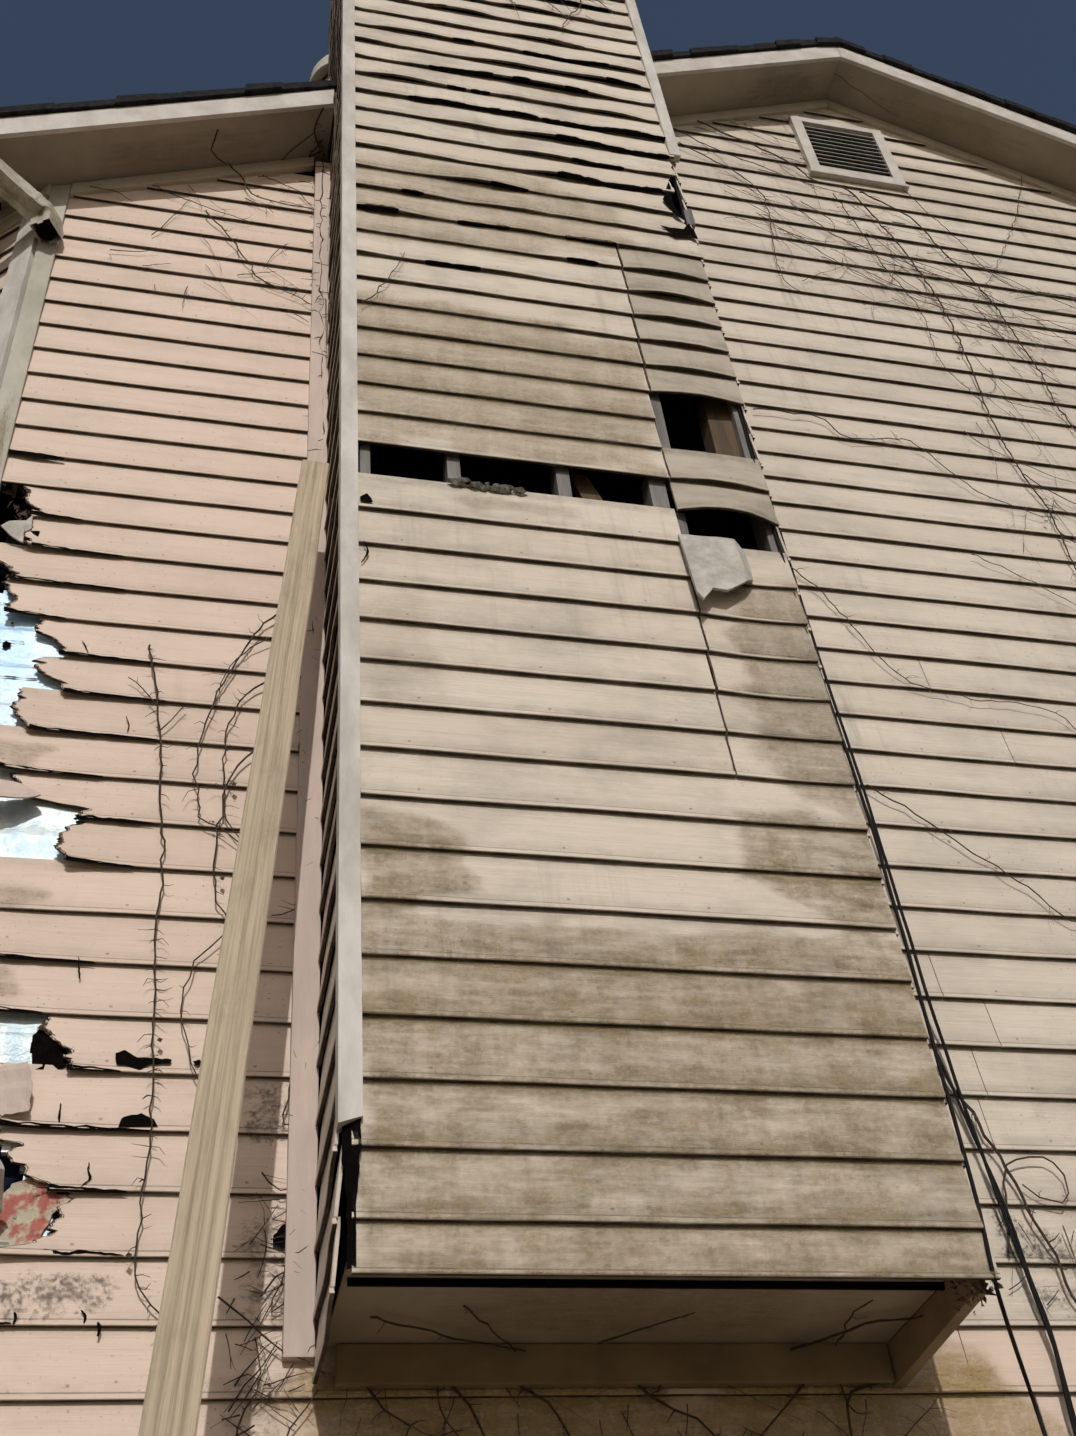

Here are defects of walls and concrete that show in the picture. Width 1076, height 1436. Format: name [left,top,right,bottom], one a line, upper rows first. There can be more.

peeling [1,515,33,543]
peeling [0,779,41,799]
water stain [361,815,470,912]
water stain [746,814,890,932]
peeling [0,1061,33,1117]
water stain [359,927,989,1330]
peeling [0,1178,71,1247]
water stain [996,1217,1074,1260]